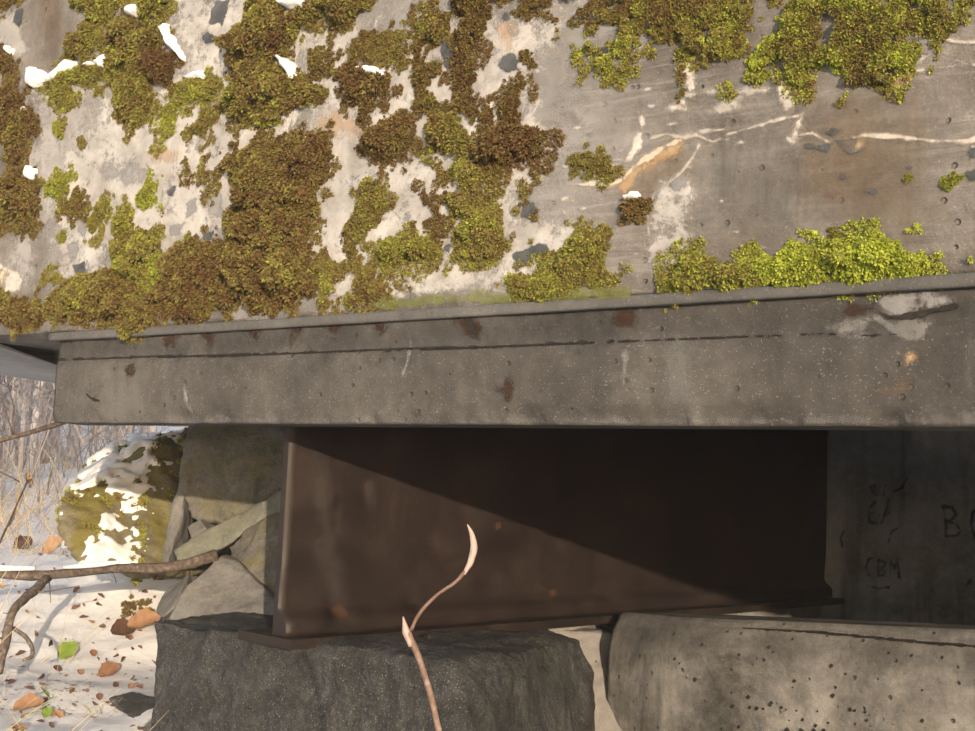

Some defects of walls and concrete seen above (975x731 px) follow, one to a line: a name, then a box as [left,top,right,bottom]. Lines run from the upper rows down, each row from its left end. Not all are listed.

crack [915,38,975,72]
corrosion [619,142,683,193]
crack [573,115,975,234]